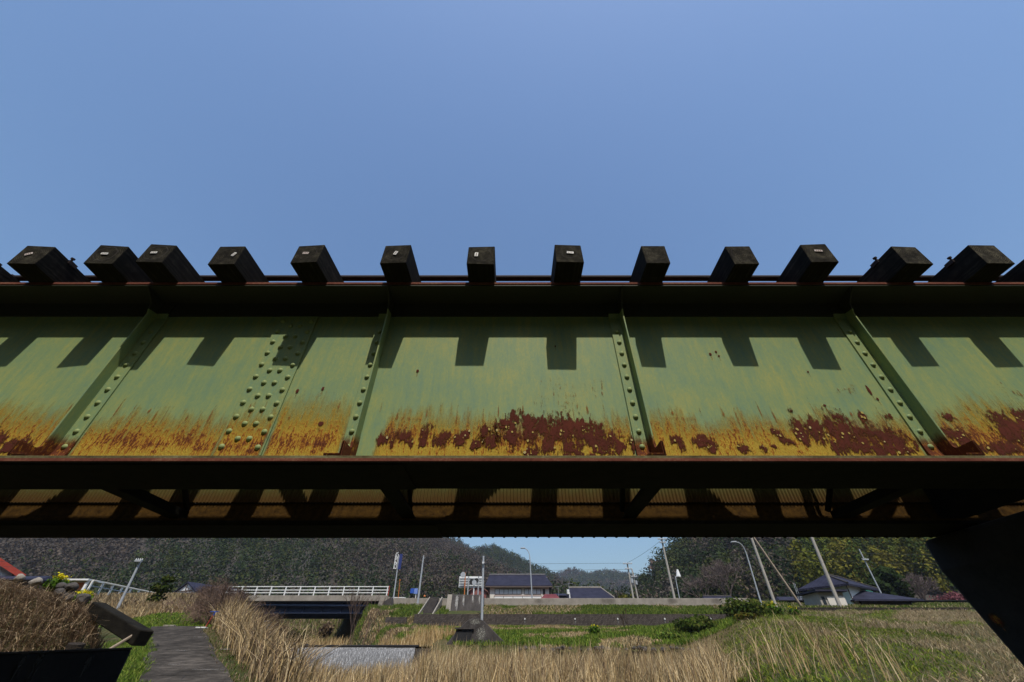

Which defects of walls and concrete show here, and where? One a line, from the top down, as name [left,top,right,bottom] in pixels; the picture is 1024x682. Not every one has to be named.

rust [0,389,359,456]
rust [373,385,1024,456]